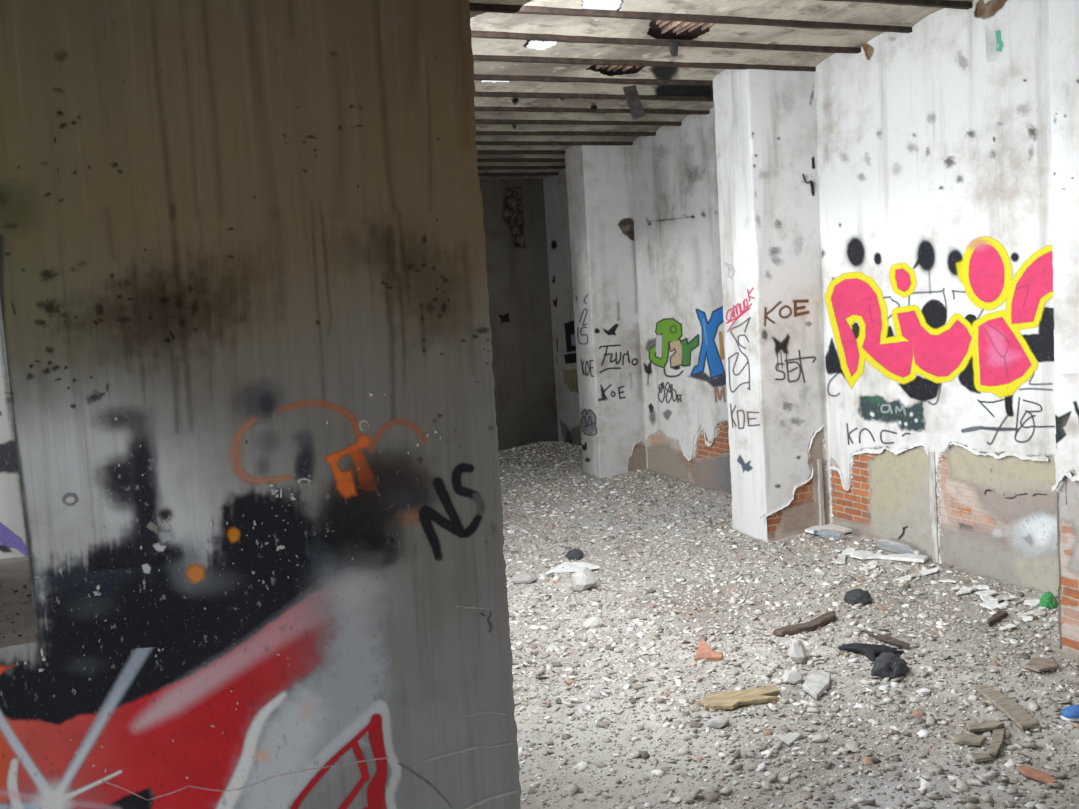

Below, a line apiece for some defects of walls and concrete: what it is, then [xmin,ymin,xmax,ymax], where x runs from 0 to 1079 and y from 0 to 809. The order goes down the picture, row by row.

spalling [648,20,715,35]
leakage [94,270,237,342]
leakage [0,235,41,650]
spalling [629,417,732,494]
spalling [760,422,1079,656]